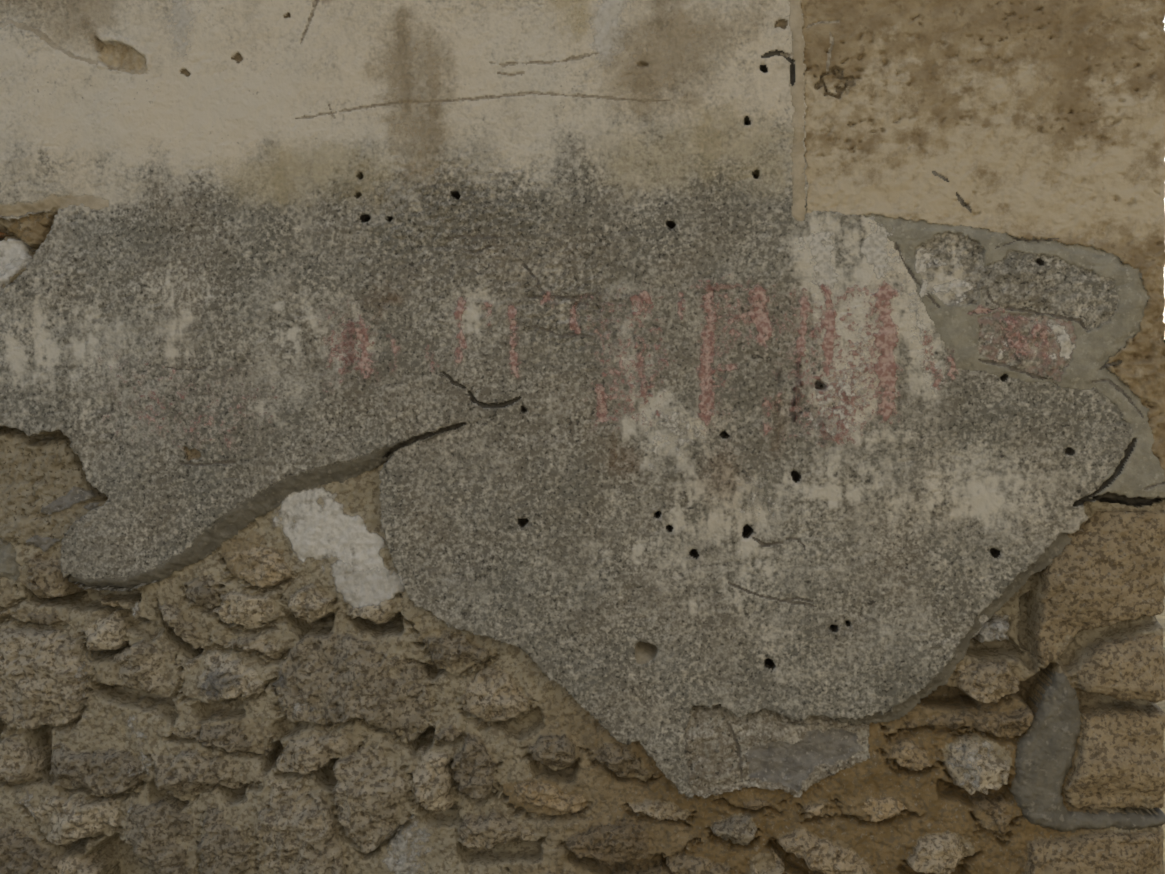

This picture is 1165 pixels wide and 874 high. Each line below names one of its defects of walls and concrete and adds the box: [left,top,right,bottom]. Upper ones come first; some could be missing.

crack [295,53,670,119]
crack [382,371,522,459]
crack [1073,360,1165,508]
spalling [0,426,108,552]
spalling [684,704,870,799]